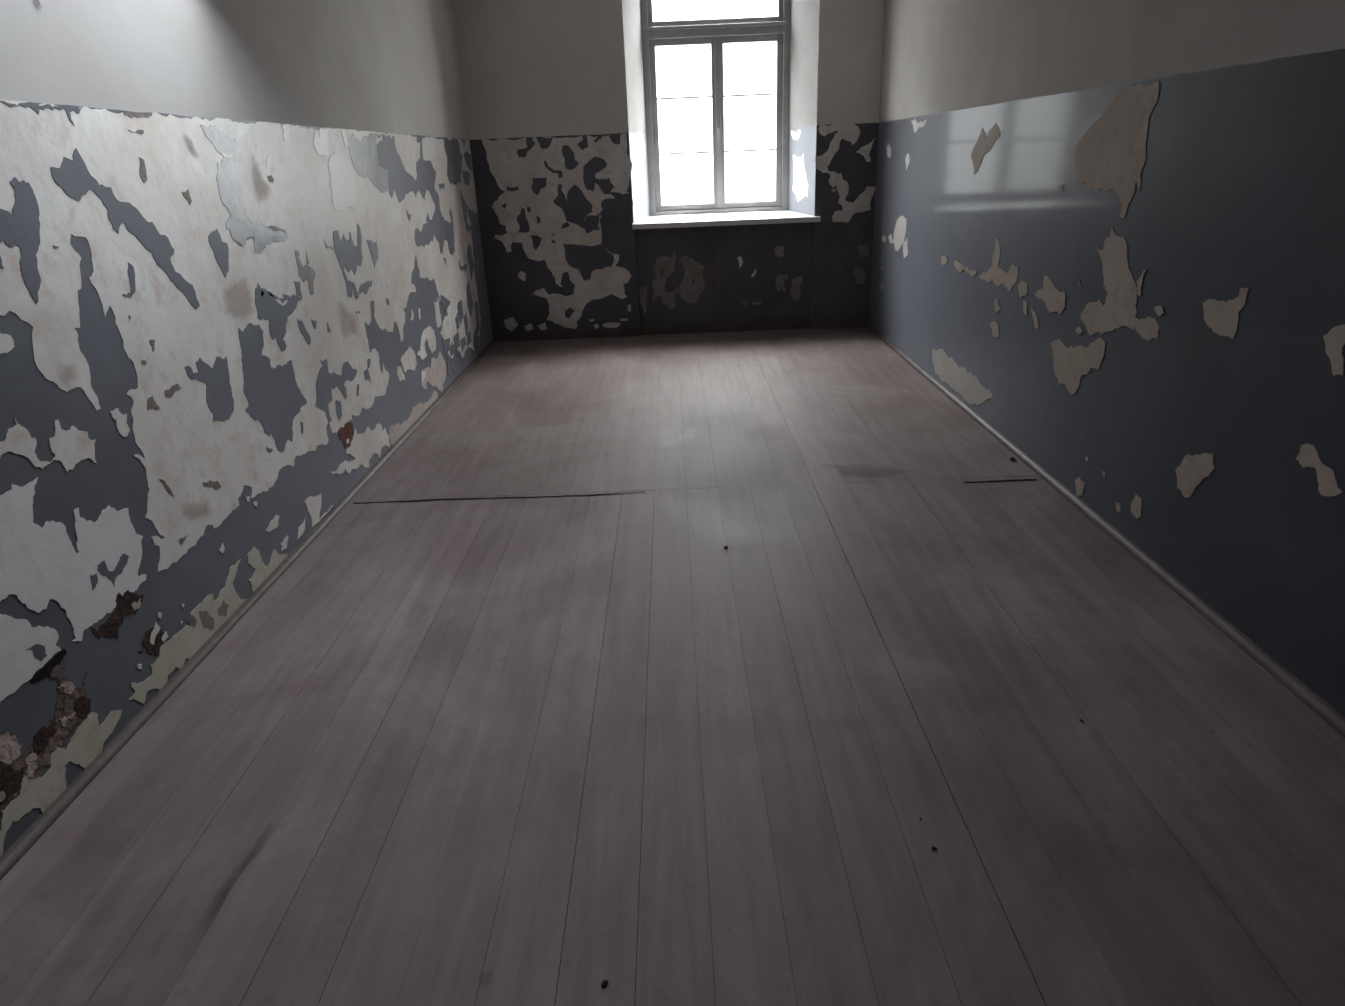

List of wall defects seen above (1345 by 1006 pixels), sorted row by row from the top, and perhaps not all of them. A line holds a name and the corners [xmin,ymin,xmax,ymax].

peeling [791,124,910,222]
peeling [970,123,1001,175]
peeling [0,100,705,702]
peeling [853,216,909,290]
peeling [932,349,995,406]
peeling [941,238,1082,338]
peeling [1051,81,1164,395]
peeling [1203,288,1249,340]
peeling [1323,324,1345,376]
peeling [1175,453,1215,498]
peeling [1296,443,1343,496]
flaking render [0,494,333,857]